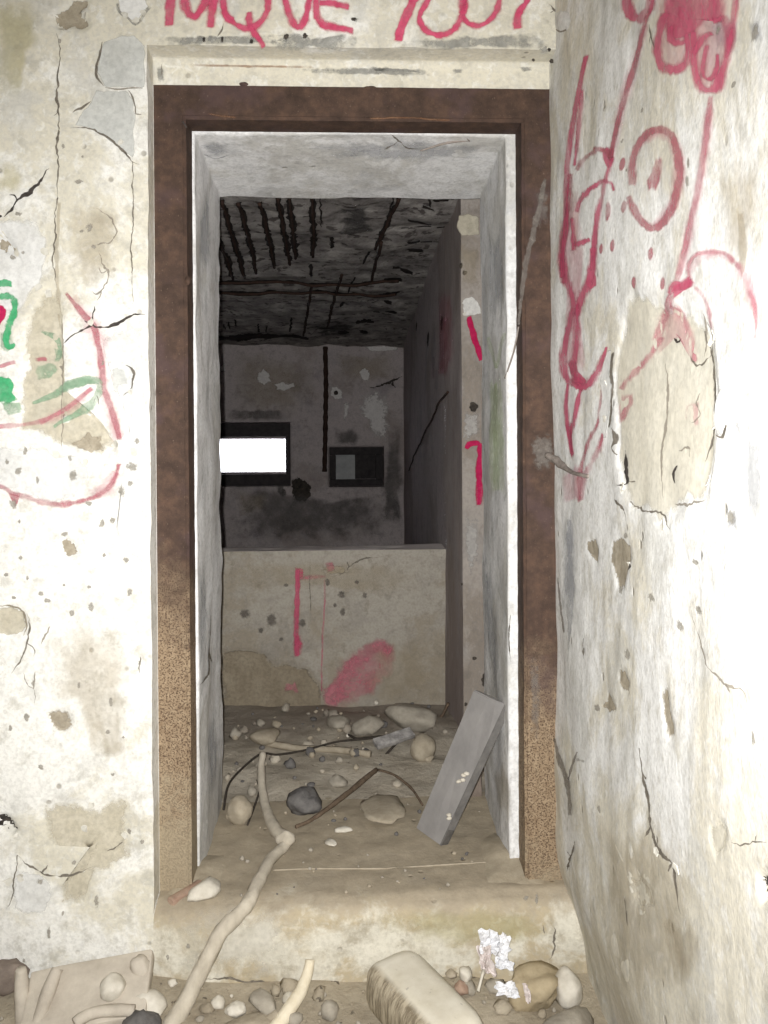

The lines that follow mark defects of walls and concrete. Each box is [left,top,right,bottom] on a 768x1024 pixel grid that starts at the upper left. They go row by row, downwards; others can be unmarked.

flaking render [76,0,149,157]
crack [0,36,145,447]
spalling [219,198,401,337]
crack [692,616,747,701]
crack [639,748,681,914]